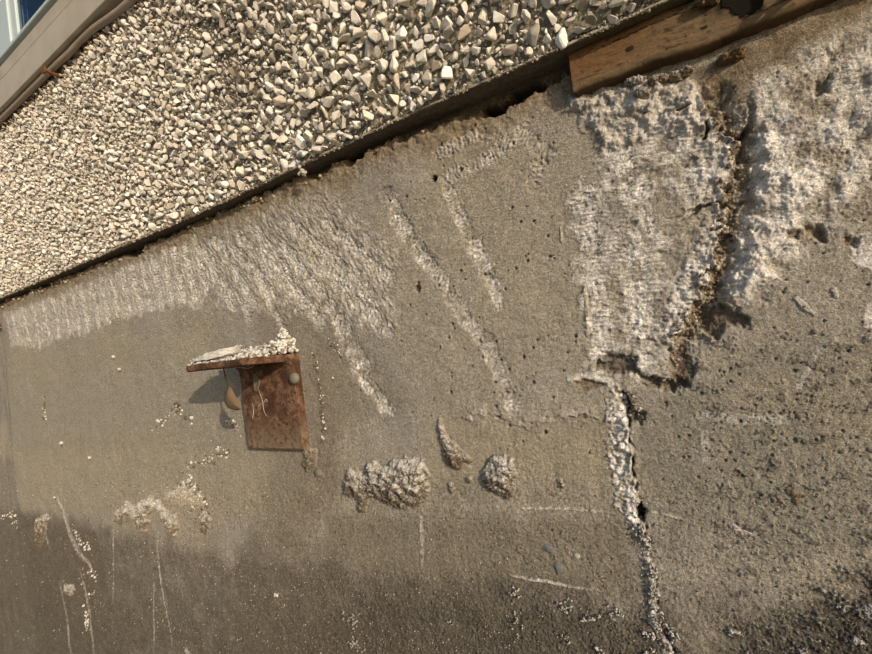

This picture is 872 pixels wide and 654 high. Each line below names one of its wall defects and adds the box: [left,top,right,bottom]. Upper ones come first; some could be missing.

spalling [0,0,660,297]
spalling [563,70,723,156]
spalling [705,20,872,317]
peeling [191,346,240,363]
leakage [0,295,872,654]
crack [593,83,757,654]